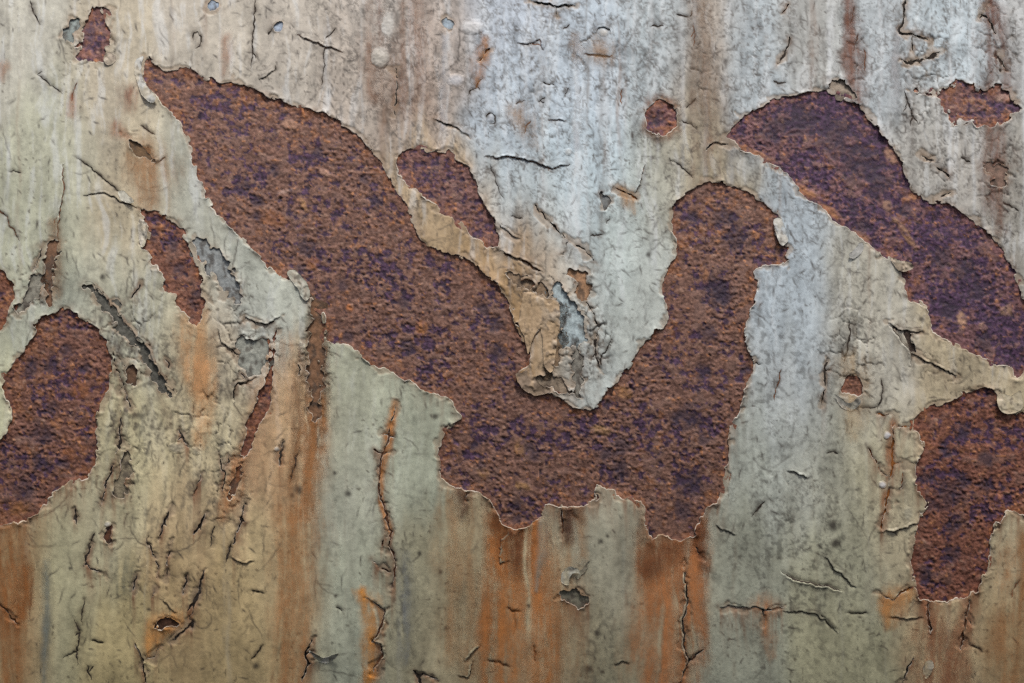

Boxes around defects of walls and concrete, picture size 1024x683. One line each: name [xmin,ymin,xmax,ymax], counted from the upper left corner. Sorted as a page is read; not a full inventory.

peeling [62,6,116,65]
peeling [0,239,138,526]
crack [73,279,178,572]
peeling [118,56,790,542]
peeling [726,78,1024,604]
crack [64,599,103,680]
crack [132,455,254,683]
crack [365,407,397,679]
corrosion [480,513,559,683]
corrosion [638,519,705,683]
crack [677,547,704,683]
crack [719,555,933,634]